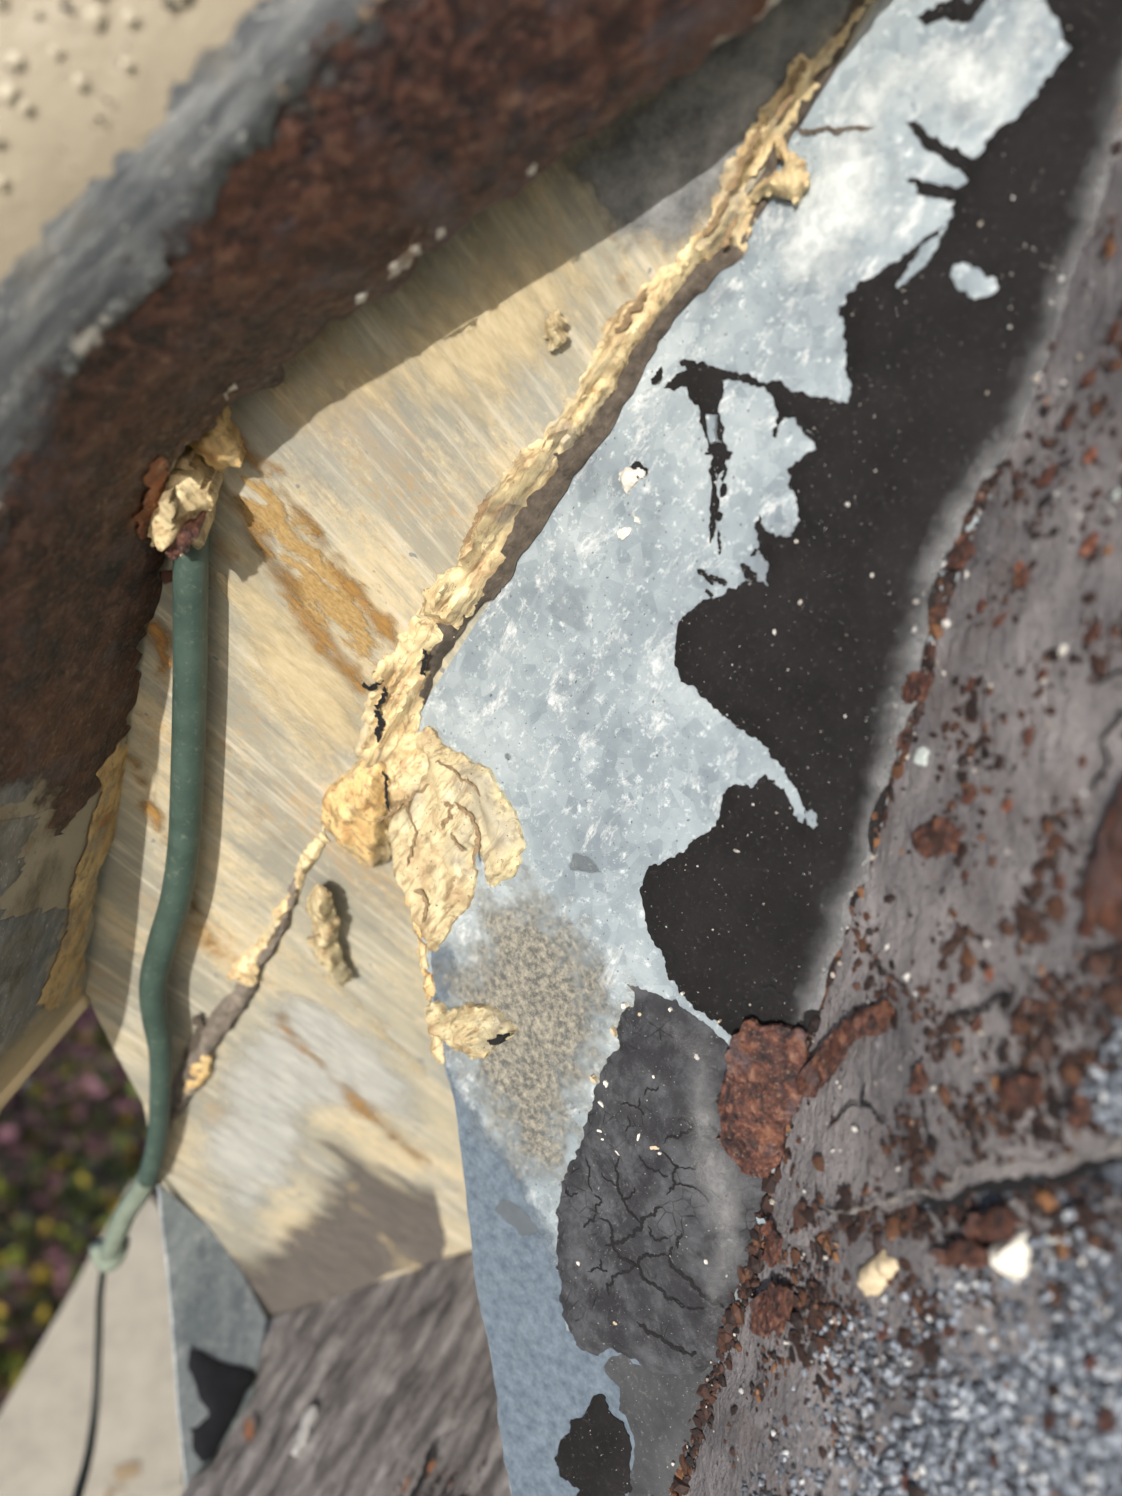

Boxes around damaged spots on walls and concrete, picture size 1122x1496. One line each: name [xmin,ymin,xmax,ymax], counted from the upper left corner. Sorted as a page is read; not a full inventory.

peeling [0,0,400,548]
peeling [896,227,947,288]
peeling [951,262,999,299]
rust [0,0,771,836]
peeling [706,414,721,444]
rust [901,669,933,704]
peeling [805,809,817,829]
rust [911,817,967,859]
peeling [0,775,67,1062]
rust [715,1018,809,1178]
crack [565,1086,735,1357]
rust [749,1219,794,1337]